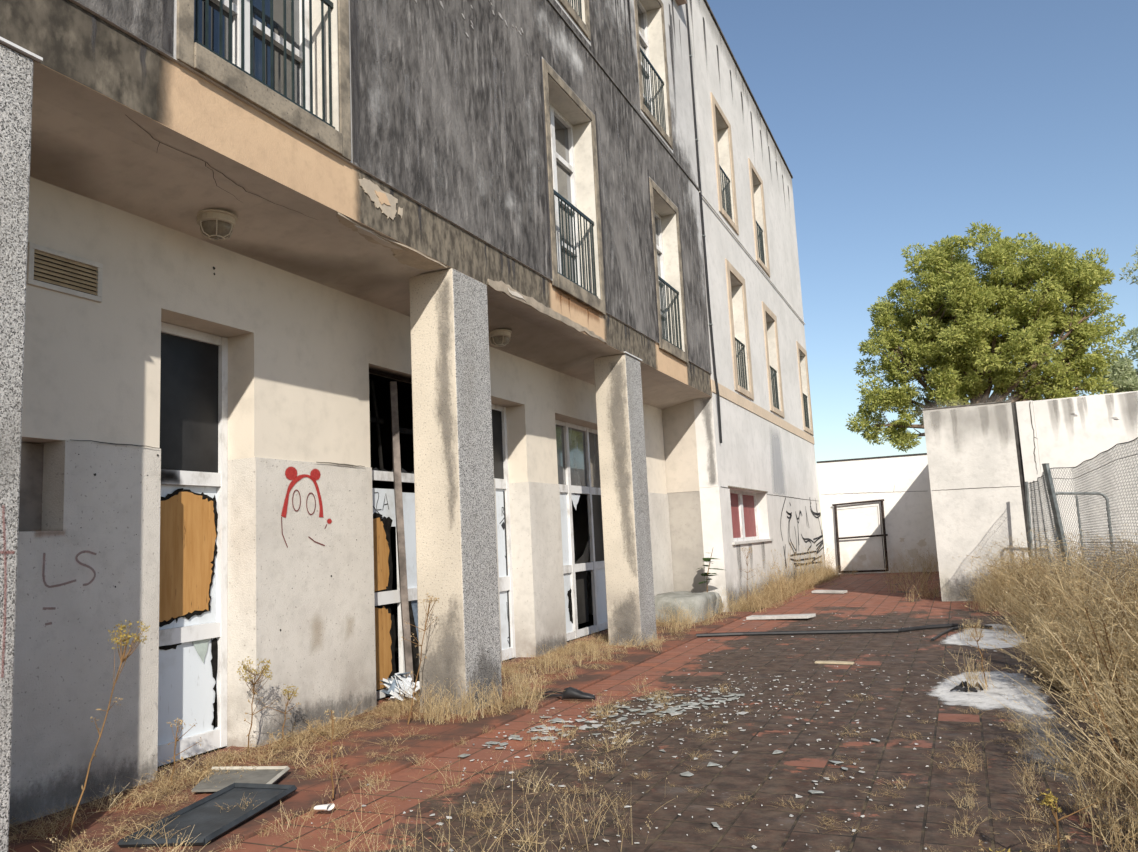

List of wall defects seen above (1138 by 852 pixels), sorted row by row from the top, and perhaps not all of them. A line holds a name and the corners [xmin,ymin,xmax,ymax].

leakage [0,0,174,124]
crack [126,115,306,216]
peeling [358,178,403,220]
leakage [350,0,712,397]